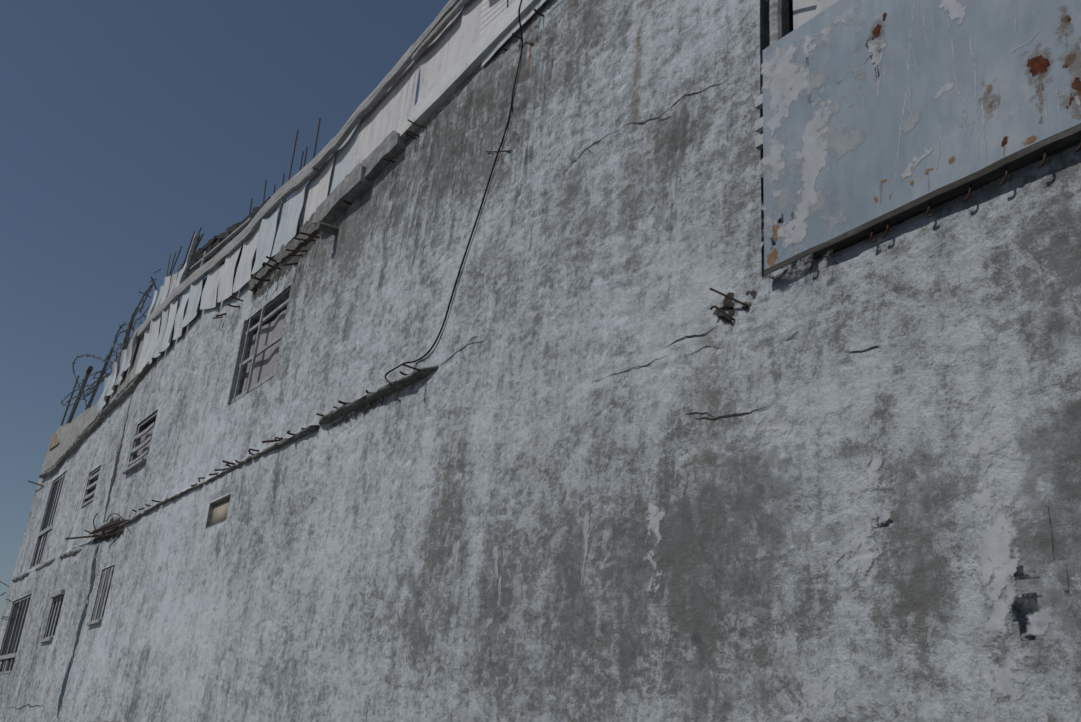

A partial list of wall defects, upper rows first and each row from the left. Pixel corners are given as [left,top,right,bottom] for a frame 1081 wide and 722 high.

rust [1027,53,1076,76]
rust [1066,77,1081,109]
crack [569,81,727,166]
peeling [757,14,847,277]
spalling [250,232,322,302]
crack [591,326,717,383]
crack [687,405,771,420]
damp [493,546,502,606]
damp [581,511,590,583]